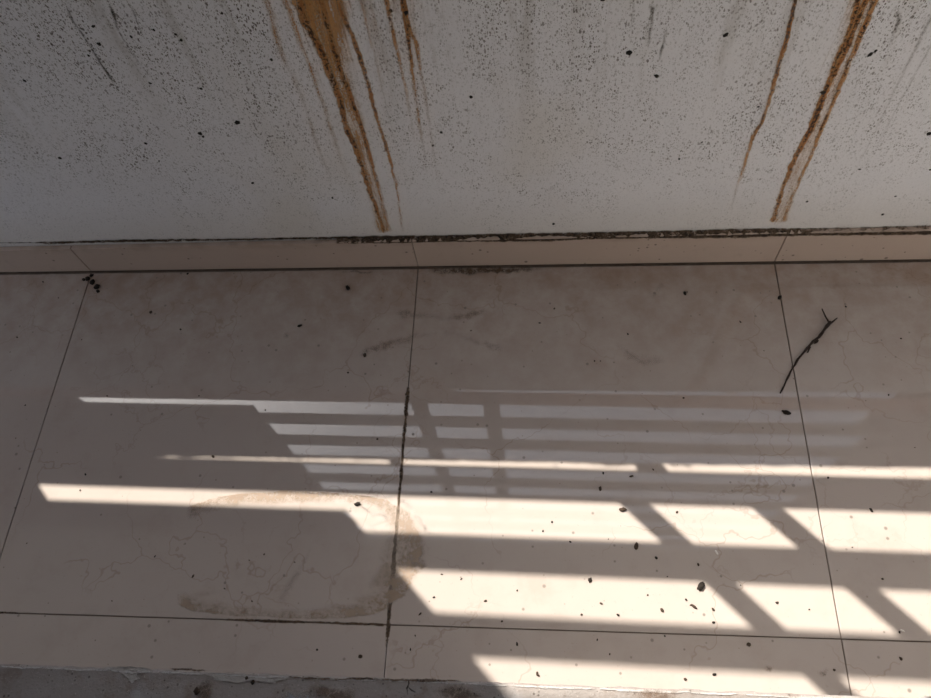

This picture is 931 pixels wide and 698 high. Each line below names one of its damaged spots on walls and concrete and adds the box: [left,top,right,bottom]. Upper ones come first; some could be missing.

rust [285,0,400,233]
rust [384,0,421,122]
rust [741,0,797,175]
rust [770,0,878,222]
leakage [191,490,424,618]